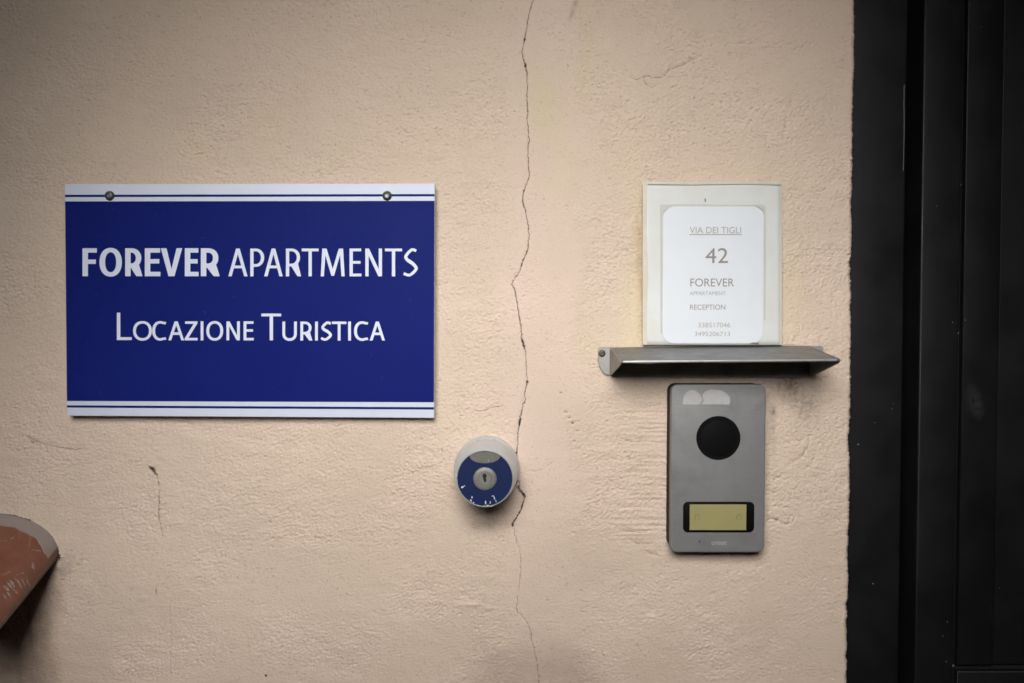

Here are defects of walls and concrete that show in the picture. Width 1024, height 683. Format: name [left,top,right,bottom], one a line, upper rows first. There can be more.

crack [481,3,532,526]